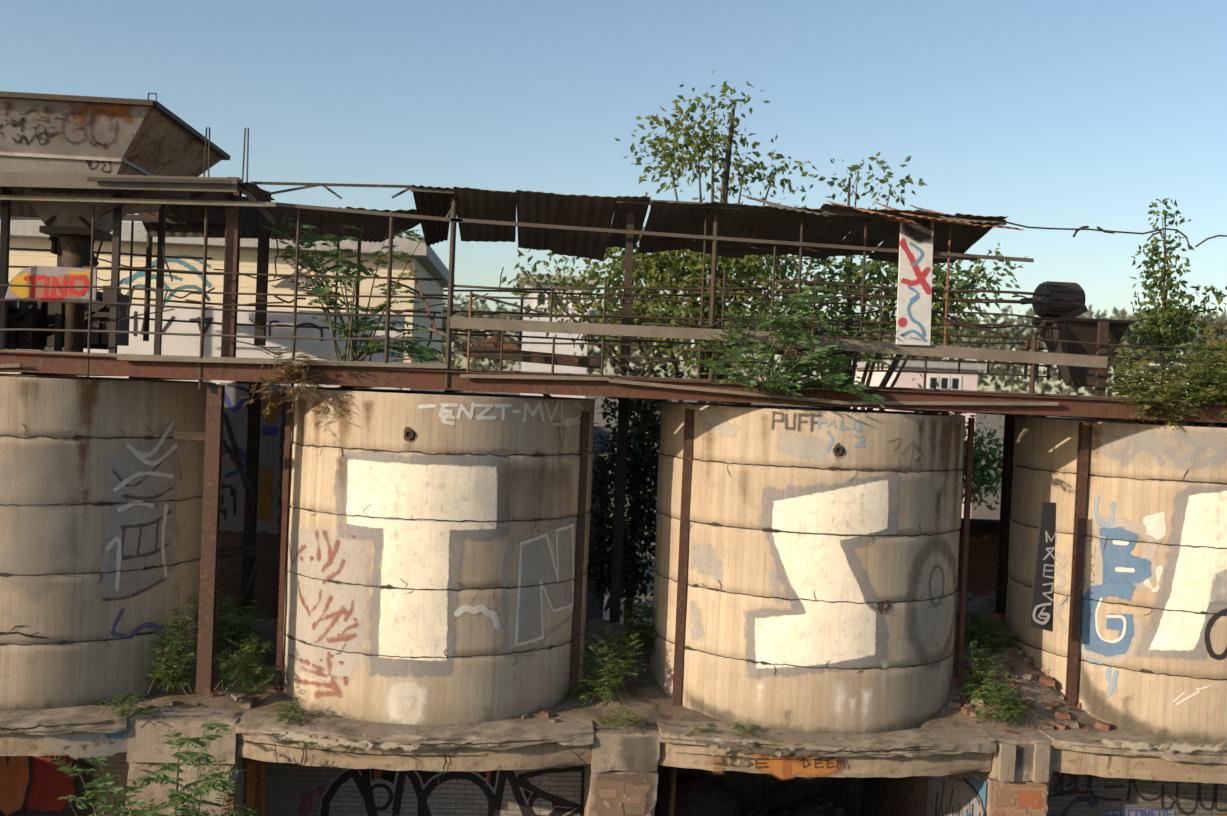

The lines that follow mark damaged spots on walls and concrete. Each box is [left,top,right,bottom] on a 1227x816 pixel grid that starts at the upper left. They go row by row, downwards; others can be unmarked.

damp [919,421,961,501]
spalling [279,731,420,751]